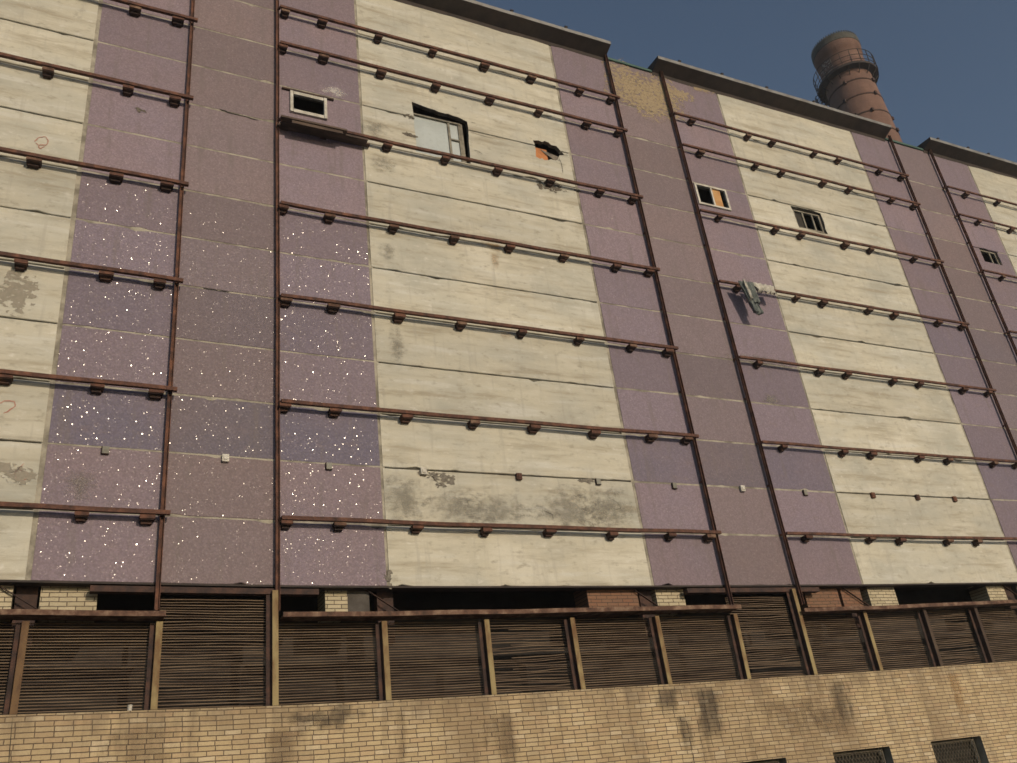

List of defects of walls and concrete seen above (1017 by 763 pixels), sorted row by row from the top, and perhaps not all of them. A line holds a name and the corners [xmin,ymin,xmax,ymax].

peeling [0,270,39,316]
peeling [0,462,38,485]